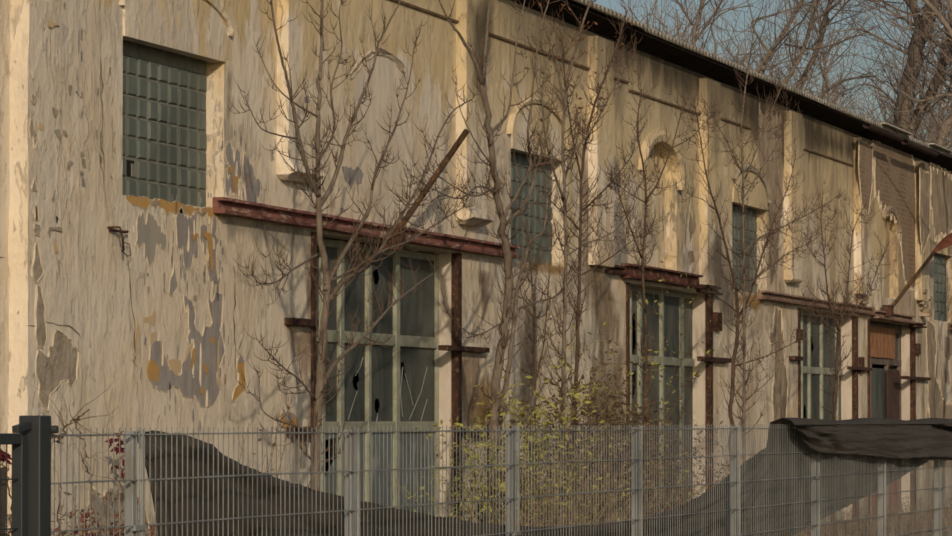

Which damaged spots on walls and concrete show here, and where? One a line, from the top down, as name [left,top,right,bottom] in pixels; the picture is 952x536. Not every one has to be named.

spalling [29,107,68,149]
peeling [222,121,261,203]
spalling [31,205,79,411]
peeling [125,192,246,431]